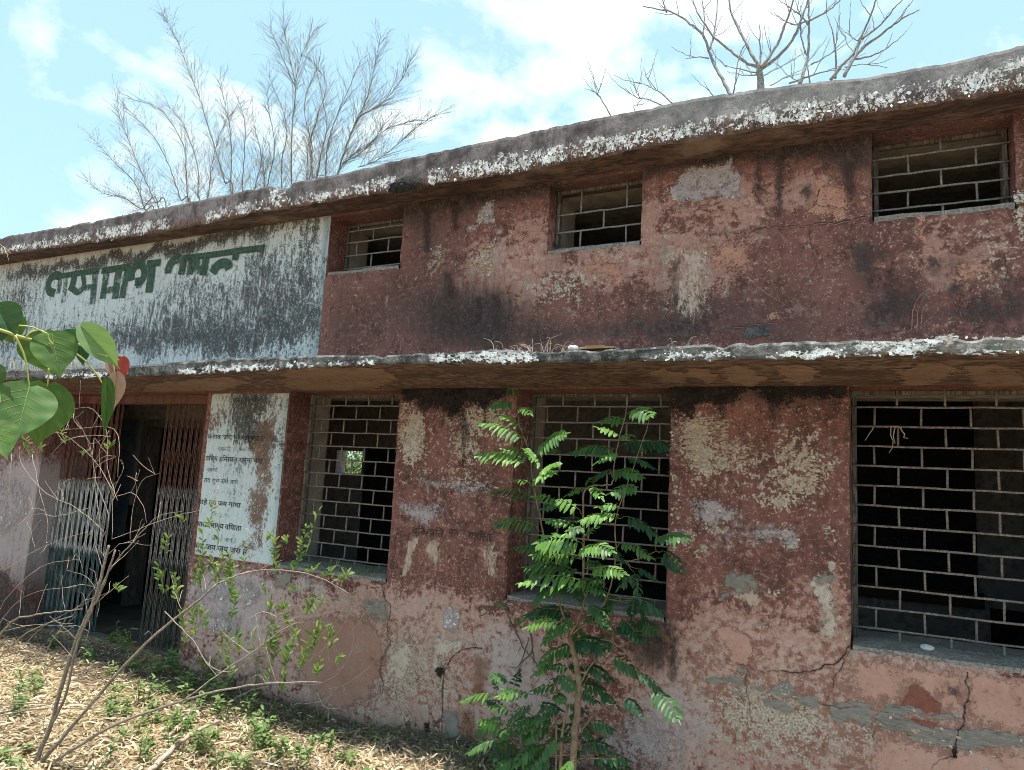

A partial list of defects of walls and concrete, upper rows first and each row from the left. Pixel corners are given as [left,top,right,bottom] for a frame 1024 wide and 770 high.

peeling [204,55,1024,225]
peeling [671,233,757,321]
crack [695,184,866,291]
peeling [394,402,419,452]
peeling [666,404,844,524]
flaking render [808,561,839,639]
crack [721,646,876,747]
peeling [699,623,1024,770]
crack [932,672,976,768]